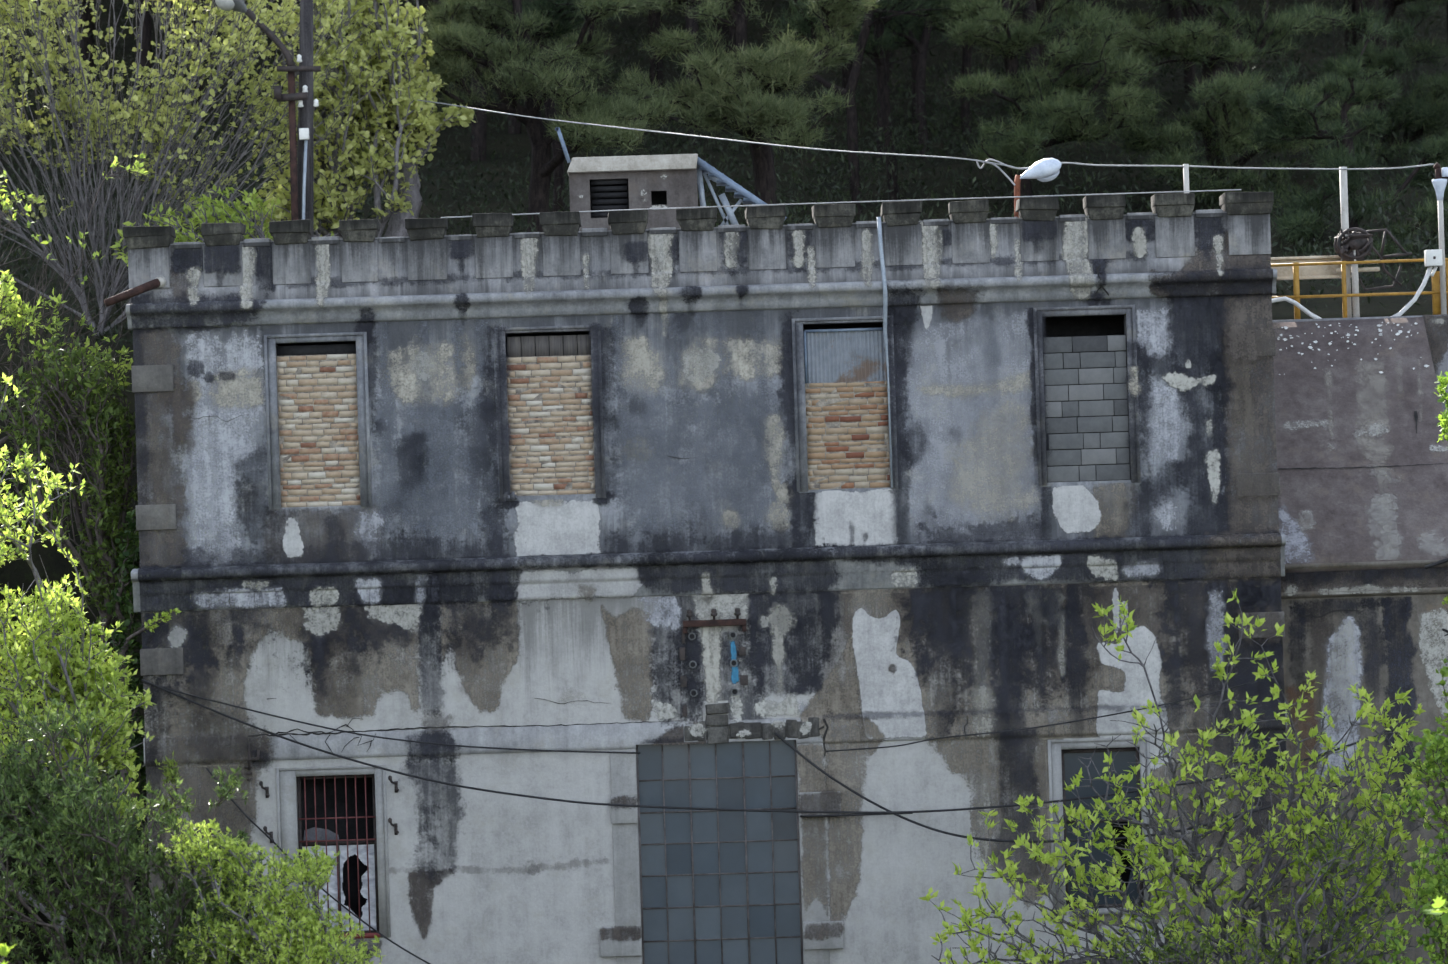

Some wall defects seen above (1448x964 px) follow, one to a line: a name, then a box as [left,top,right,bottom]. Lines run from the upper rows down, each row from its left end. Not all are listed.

peeling [1162,360,1216,392]
peeling [1206,419,1221,503]
peeling [282,518,304,558]
peeling [513,499,643,603]
leakage [127,217,1448,964]
peeling [813,489,899,547]
peeling [890,568,918,589]
peeling [1007,555,1062,580]
peeling [1052,485,1102,534]
peeling [852,608,927,740]
peeling [1087,556,1173,770]
peeling [1122,913,1145,942]